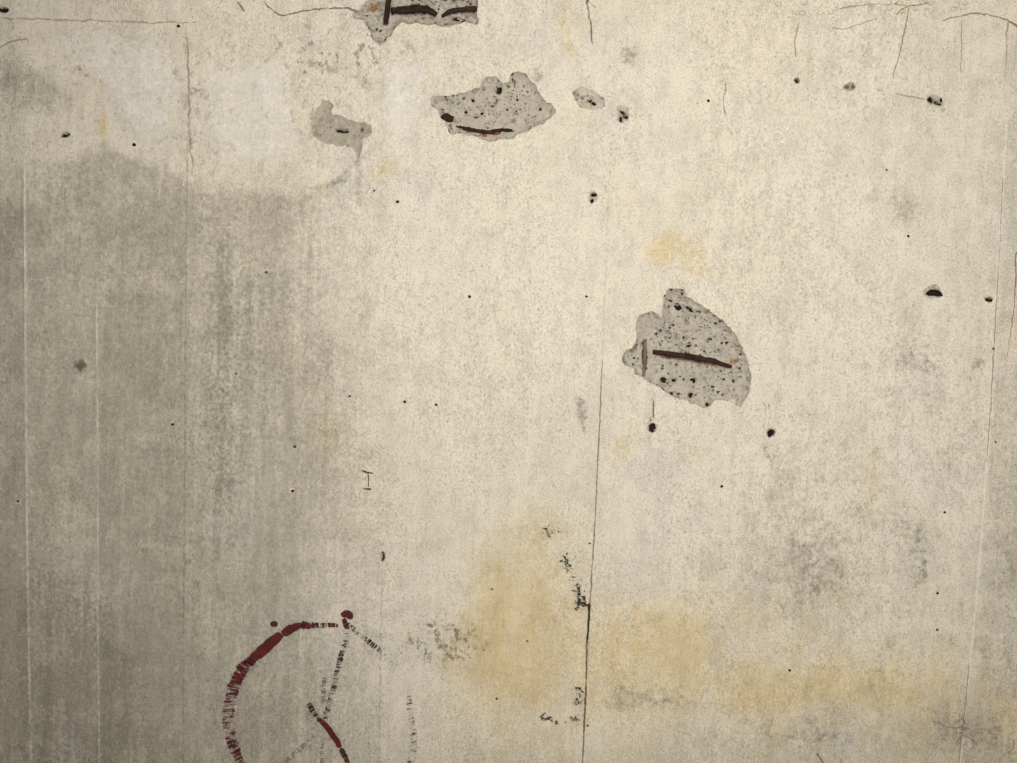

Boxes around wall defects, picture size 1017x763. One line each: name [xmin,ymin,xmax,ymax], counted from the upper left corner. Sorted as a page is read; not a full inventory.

spalling [352,0,479,45]
crack [893,0,1017,77]
spalling [430,71,556,142]
crack [1007,252,1017,356]
spalling [622,288,751,408]
leakage [558,552,587,613]
crack [579,359,603,763]
leakage [540,687,584,724]